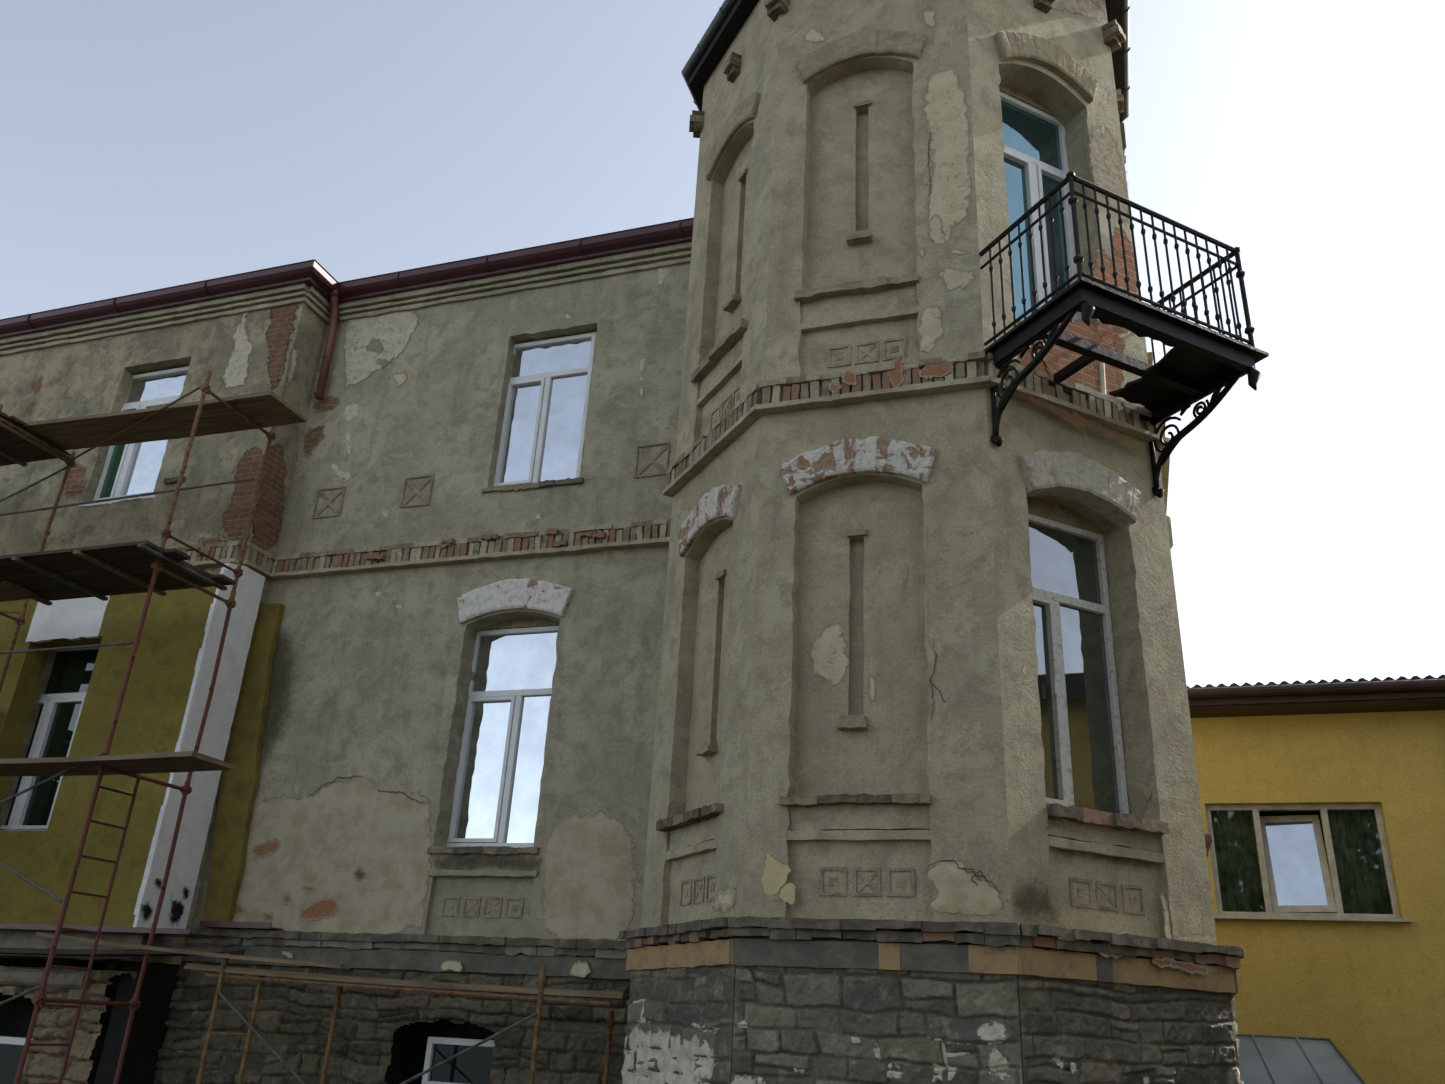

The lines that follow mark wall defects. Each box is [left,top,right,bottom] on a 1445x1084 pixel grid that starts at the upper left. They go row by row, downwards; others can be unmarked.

peeling [918,68,976,291]
peeling [221,307,253,388]
peeling [343,310,420,387]
peeling [887,306,954,387]
peeling [330,403,359,481]
peeling [809,623,849,686]
crack [930,643,945,718]
crack [306,776,430,803]
peeling [761,853,796,905]
peeling [621,998,720,1084]
peeling [731,1074,766,1084]